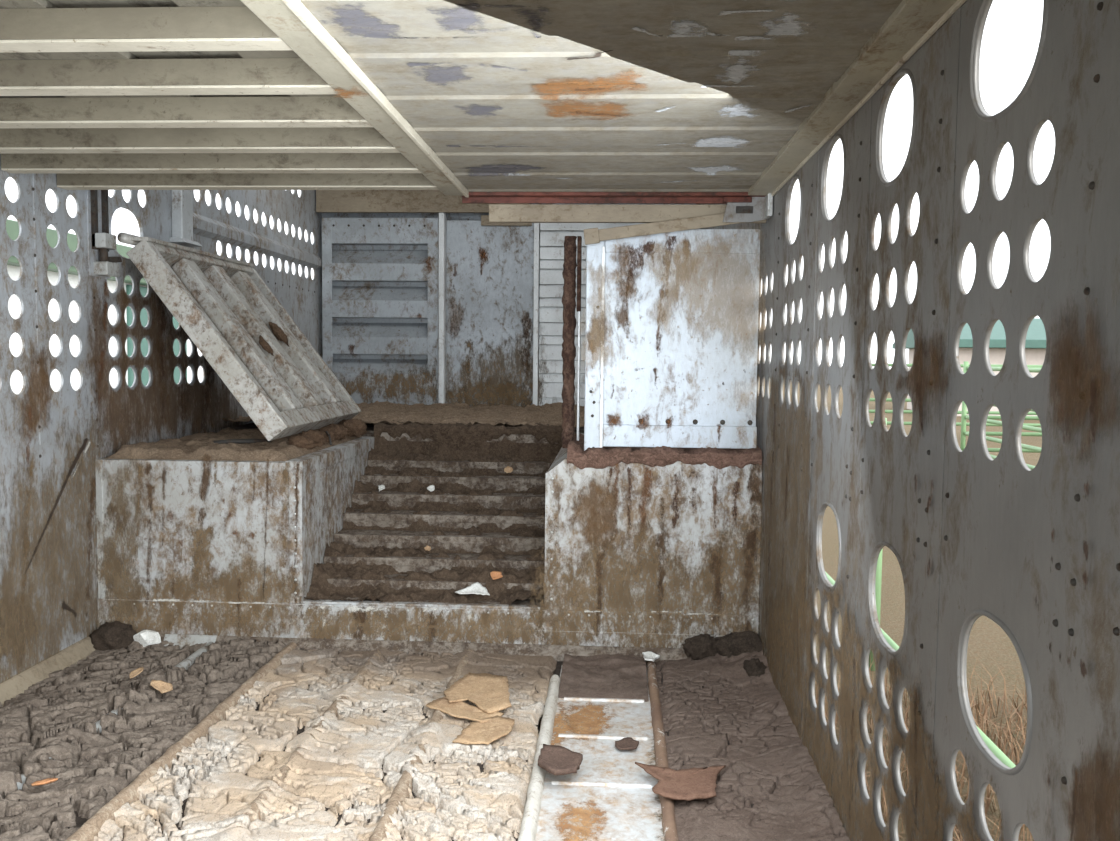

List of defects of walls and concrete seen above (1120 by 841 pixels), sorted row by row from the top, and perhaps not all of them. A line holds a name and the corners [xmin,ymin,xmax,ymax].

rust [532,71,645,120]
water stain [521,312,531,389]
rust [587,236,690,382]
rust [1047,308,1118,453]
water stain [88,477,96,573]
water stain [263,459,299,594]
rust [572,464,697,547]
rust [733,463,763,561]
rust [551,703,616,745]
rust [555,801,606,841]
rust [1068,746,1120,841]